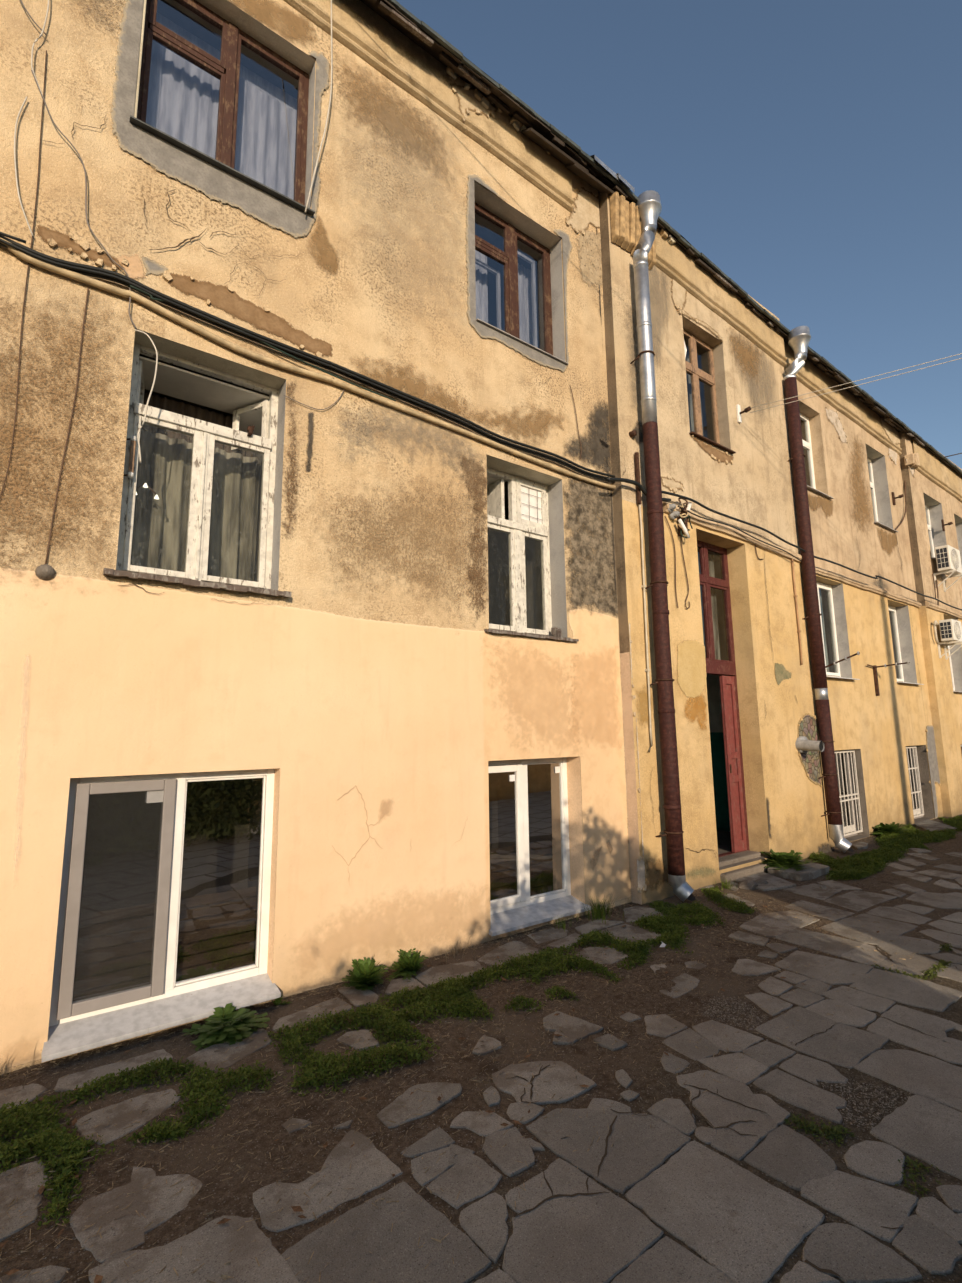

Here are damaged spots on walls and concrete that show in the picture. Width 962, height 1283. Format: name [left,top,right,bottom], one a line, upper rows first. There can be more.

flaking render [37,225,333,358]
crack [143,189,304,296]
damp [306,412,314,471]
damp [563,404,618,617]
flaking render [775,663,791,685]
spalling [798,713,823,787]
crack [333,786,411,884]